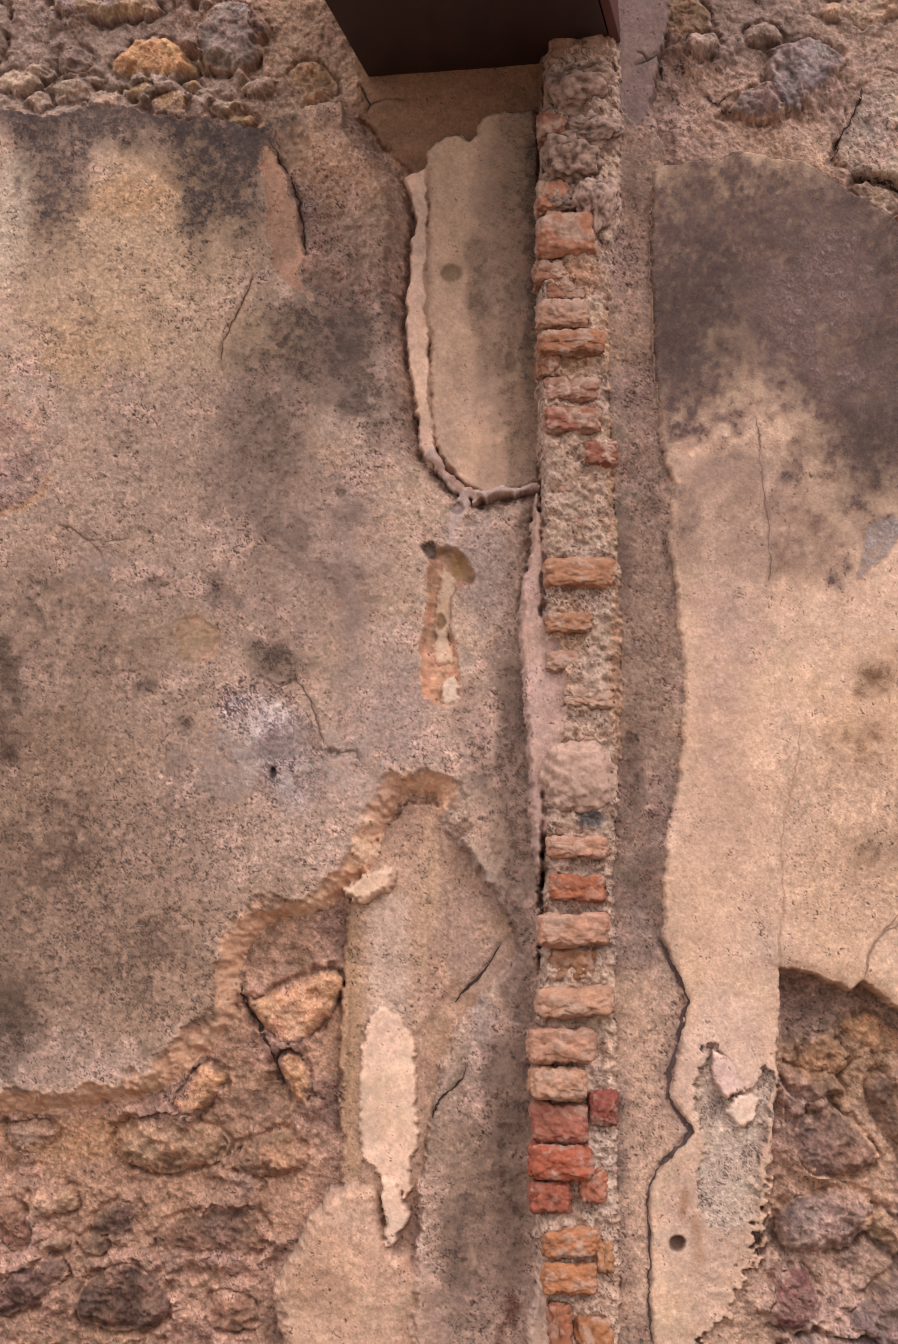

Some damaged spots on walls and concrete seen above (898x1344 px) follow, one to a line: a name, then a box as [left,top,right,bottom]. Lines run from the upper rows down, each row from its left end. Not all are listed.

leakage [0,101,303,244]
leakage [624,151,898,587]
flaking render [419,546,477,709]
flaking render [343,866,398,905]
flaking render [358,1007,421,1248]
crack [646,943,695,1339]